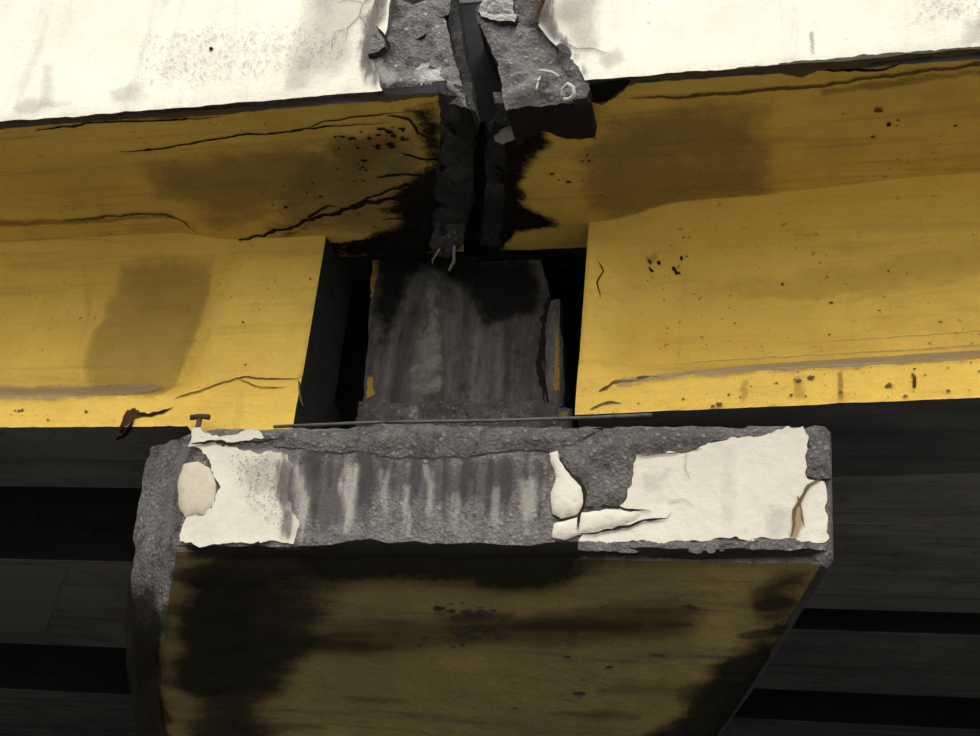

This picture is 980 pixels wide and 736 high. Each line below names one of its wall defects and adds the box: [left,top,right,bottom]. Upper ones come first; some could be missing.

crack [331,0,375,52]
crack [630,62,980,99]
spalling [0,0,980,271]
crack [129,112,439,251]
water stain [486,140,546,251]
crack [0,213,198,234]
crack [116,374,305,441]
crack [190,437,284,445]
spalling [804,428,832,481]
spalling [578,538,828,557]
water stain [131,446,820,736]